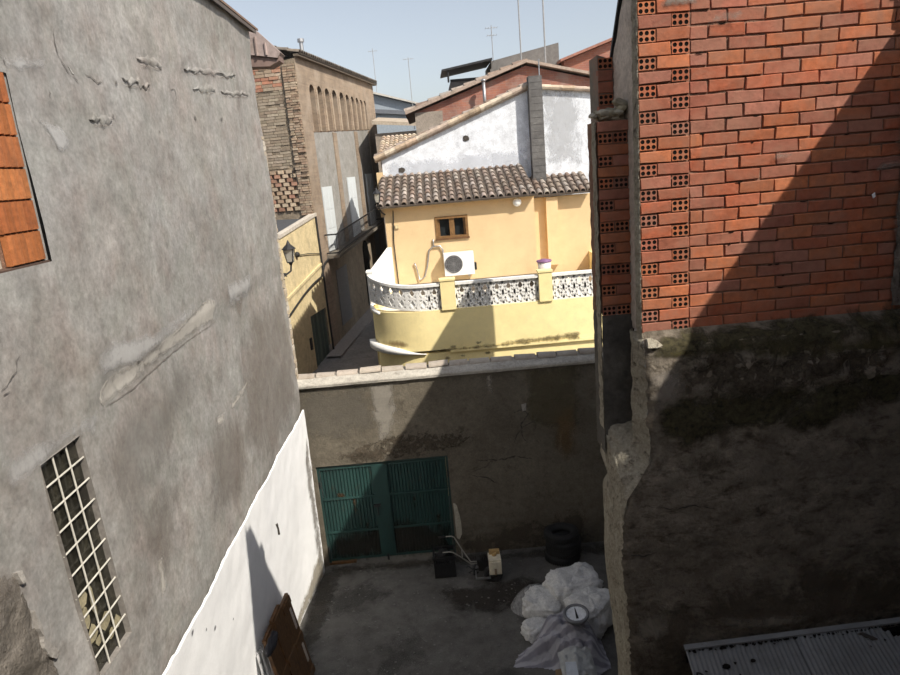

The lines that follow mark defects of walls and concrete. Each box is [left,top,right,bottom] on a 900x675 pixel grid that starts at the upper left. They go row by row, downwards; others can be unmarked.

crack [53,29,102,84]
peeling [100,300,215,411]
spalling [341,429,470,464]
spalling [630,327,652,464]
water stain [656,308,900,357]
water stain [660,371,900,447]
spalling [0,570,60,675]
spalling [603,473,631,675]